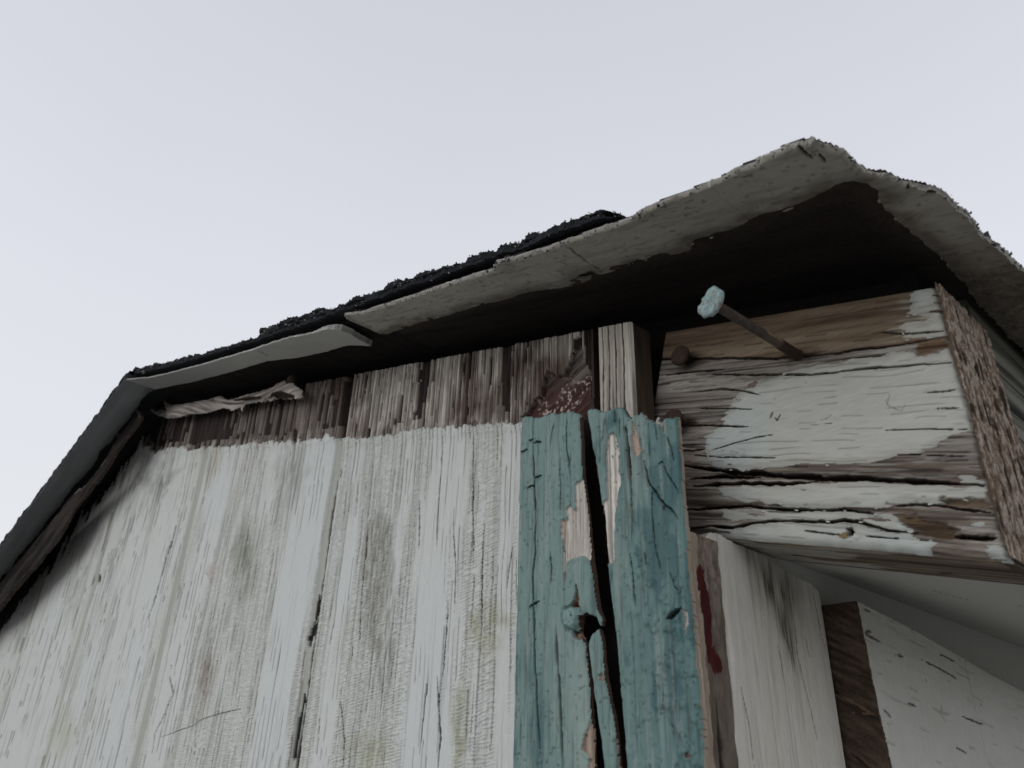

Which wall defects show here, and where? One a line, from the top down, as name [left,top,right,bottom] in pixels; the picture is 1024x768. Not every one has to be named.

peeling [144,329,594,452]
crack [602,321,1024,541]
peeling [653,288,1008,561]
peeling [560,479,592,580]
peeling [597,432,621,563]
peeling [582,721,597,768]